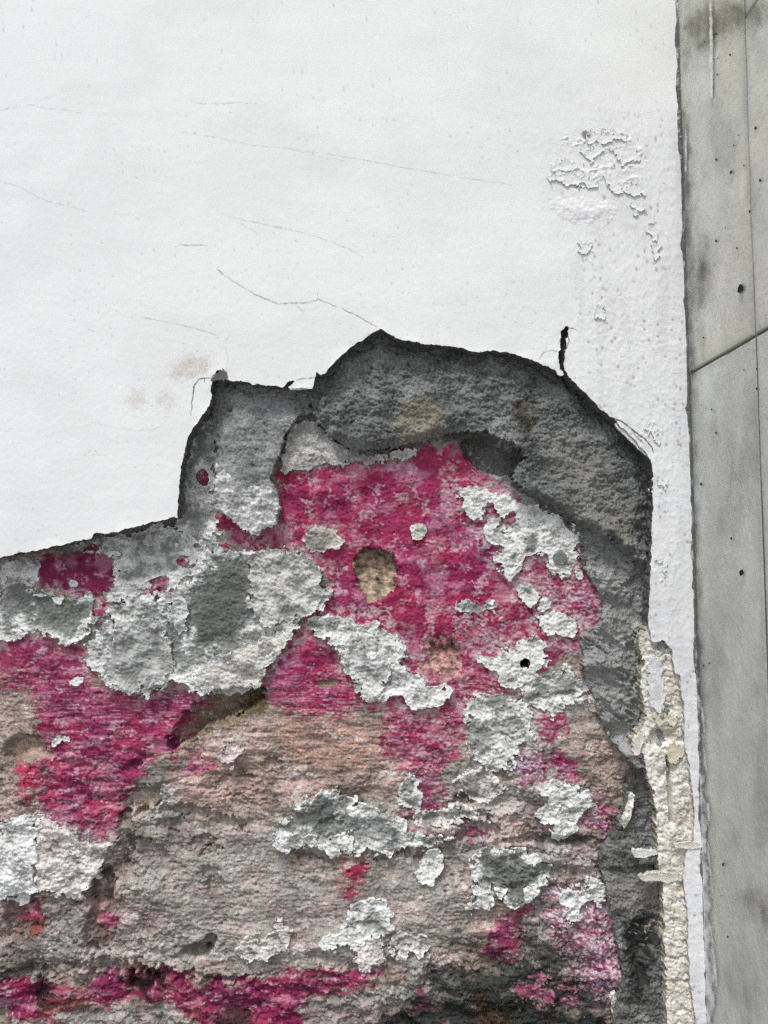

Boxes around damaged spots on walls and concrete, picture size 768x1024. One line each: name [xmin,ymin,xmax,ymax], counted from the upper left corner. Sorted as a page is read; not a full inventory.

peeling [542,122,663,260]
spalling [0,326,702,1024]